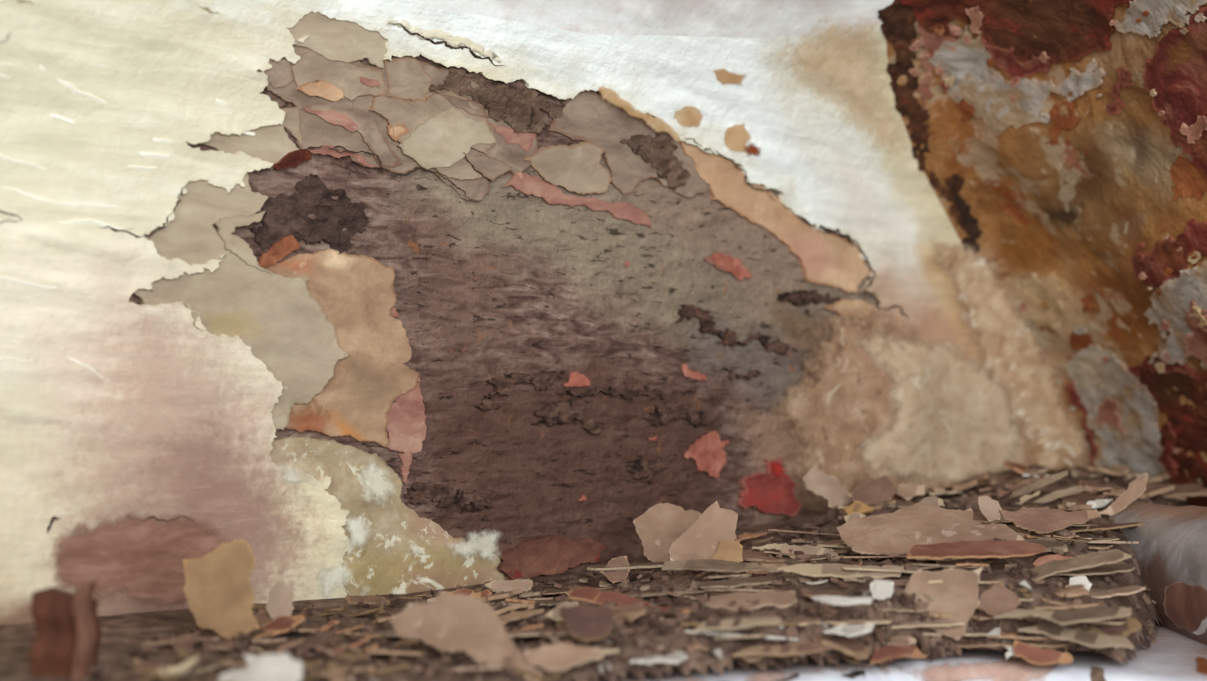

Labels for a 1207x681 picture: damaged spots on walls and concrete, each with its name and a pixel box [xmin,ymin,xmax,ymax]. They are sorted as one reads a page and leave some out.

corrosion [908,0,1134,82]
crack [0,208,22,248]
corrosion [1131,218,1207,291]
peeling [128,0,1166,598]
corrosion [1069,332,1092,351]
corrosion [1128,355,1207,507]
damp [363,464,393,500]
damp [347,517,368,551]
damp [455,532,497,558]
peeling [183,540,294,639]
peeling [506,503,1134,681]
peeling [1163,582,1207,635]